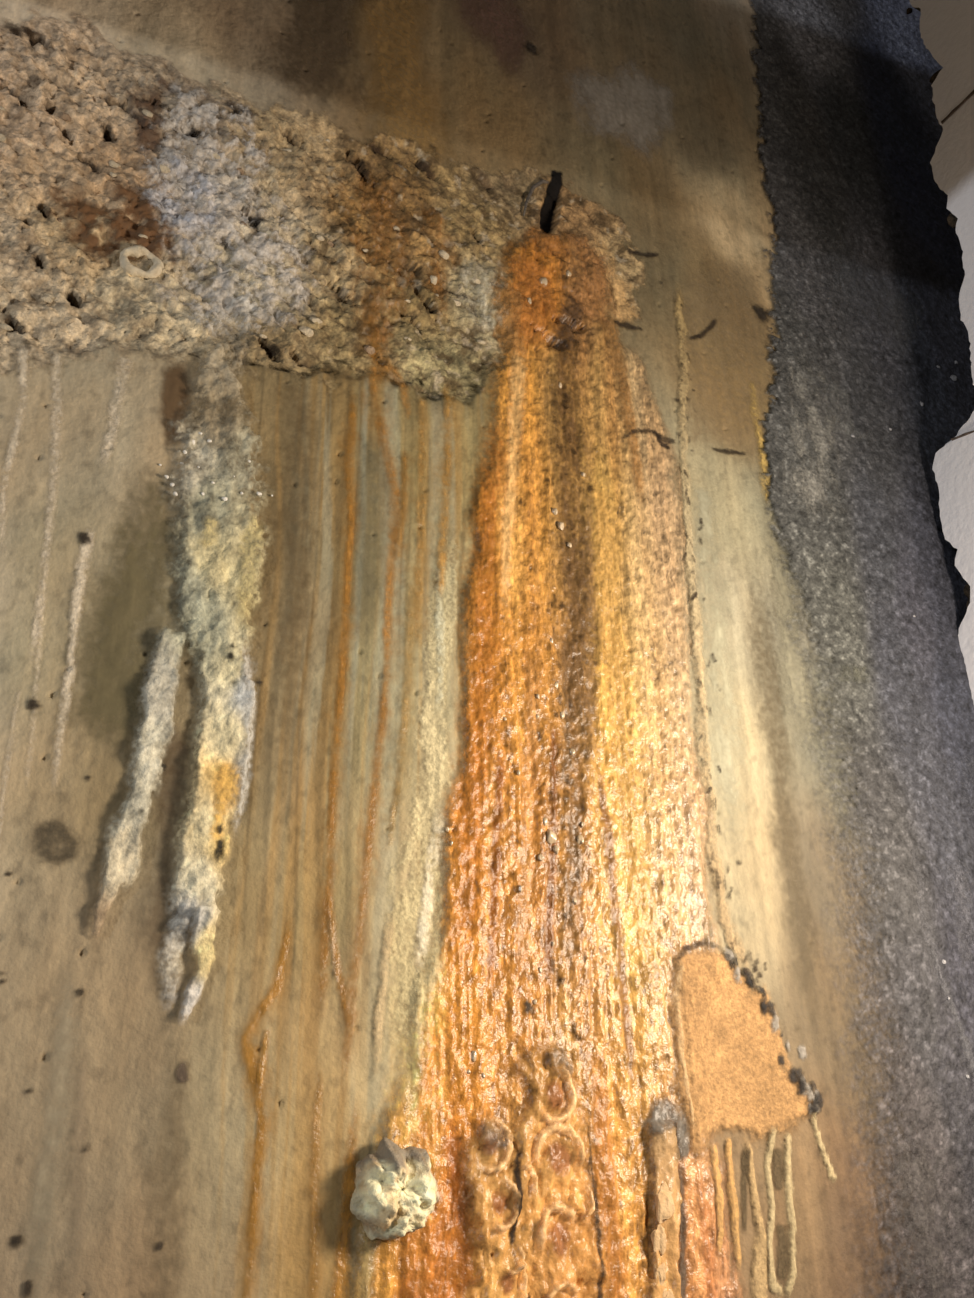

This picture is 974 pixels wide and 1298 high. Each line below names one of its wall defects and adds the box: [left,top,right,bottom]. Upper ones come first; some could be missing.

leakage [79,84,307,1019]
corrosion [243,933,290,1295]
spalling [0,9,645,402]
corrosion [322,866,354,1024]
corrosion [334,228,741,1298]
peeling [675,292,823,1114]